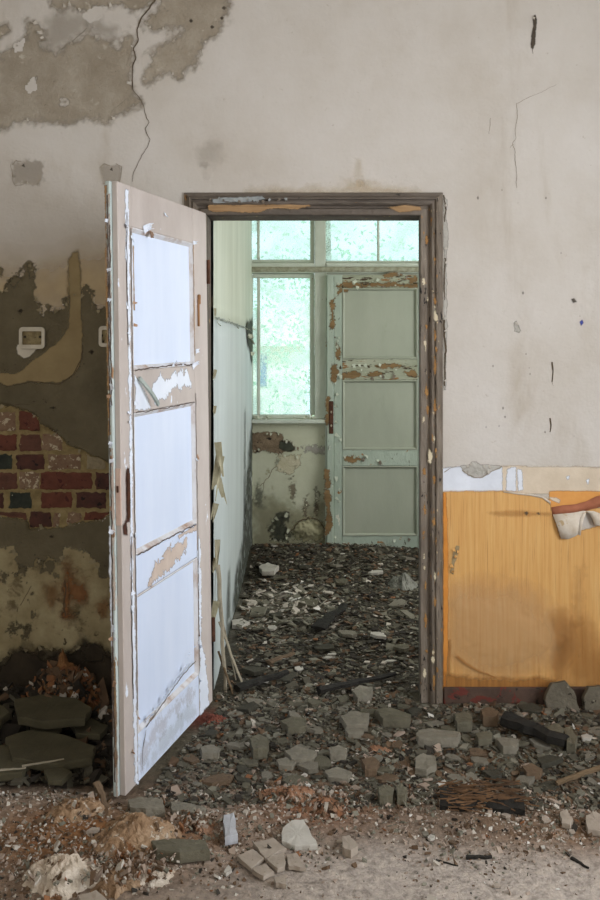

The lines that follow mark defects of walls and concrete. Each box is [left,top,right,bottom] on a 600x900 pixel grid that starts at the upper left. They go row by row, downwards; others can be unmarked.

flaking render [0,0,231,129]
crack [112,0,156,182]
crack [512,86,553,186]
flaking render [0,261,116,664]
flaking render [268,511,293,542]
flaking render [252,431,325,516]
peeling [422,436,600,690]